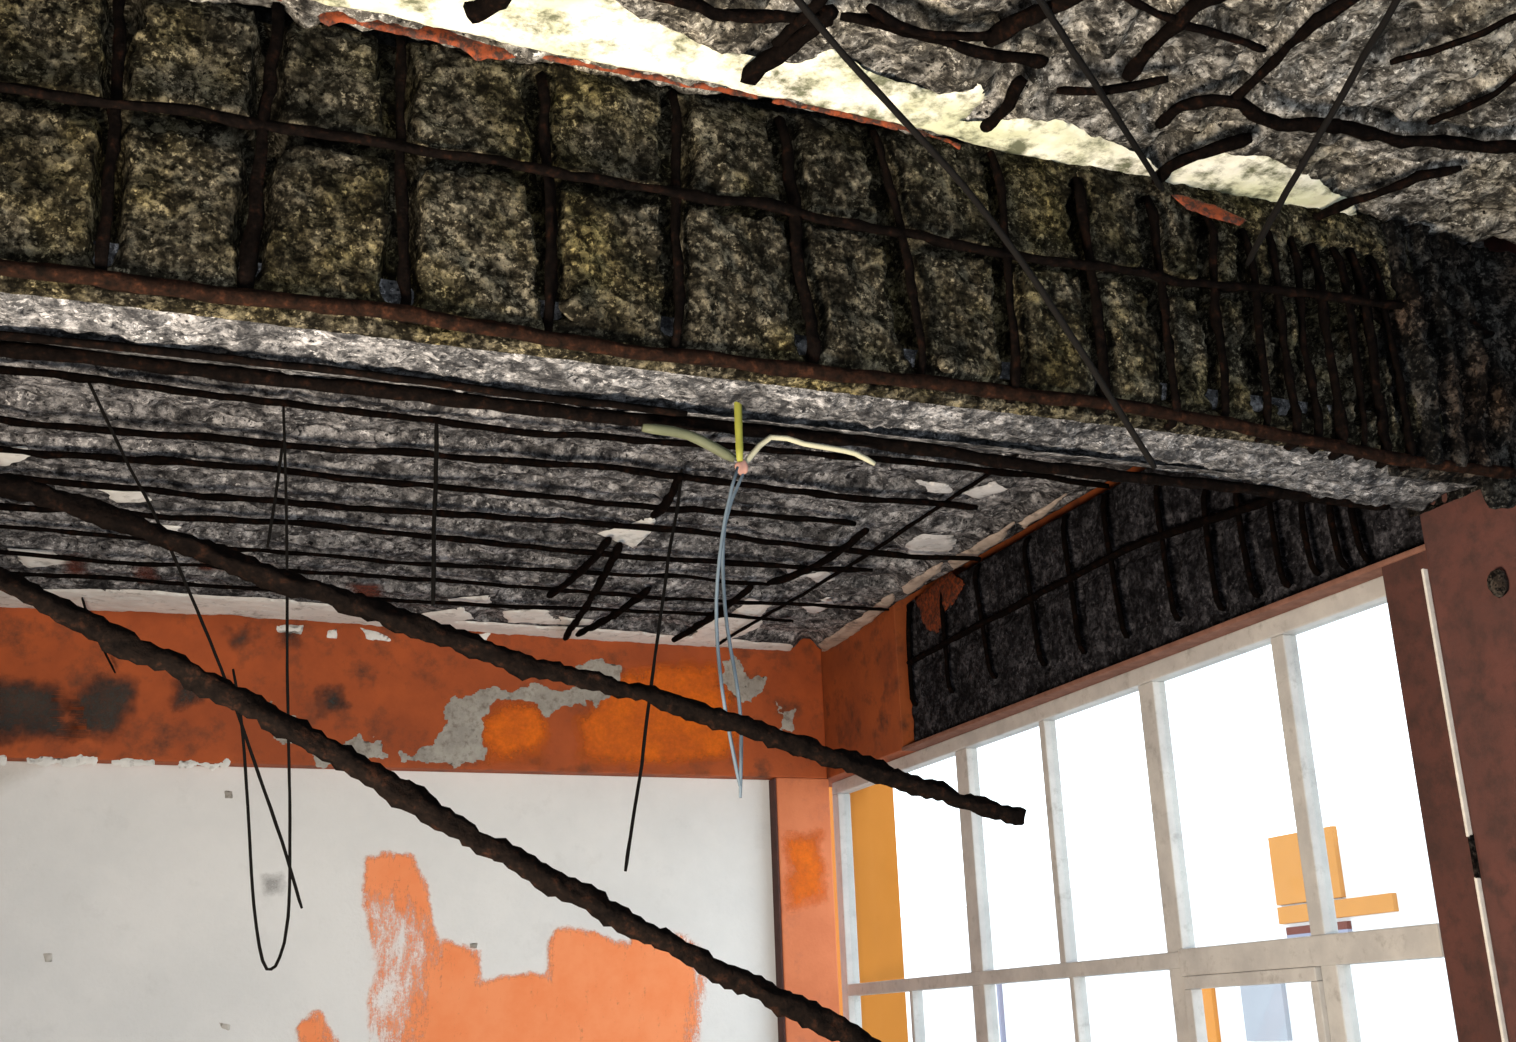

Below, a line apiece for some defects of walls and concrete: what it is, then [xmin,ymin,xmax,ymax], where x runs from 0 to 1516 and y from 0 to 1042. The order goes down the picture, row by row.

spalling [0,0,1516,769]
leakage [0,679,135,743]
spalling [178,758,231,771]